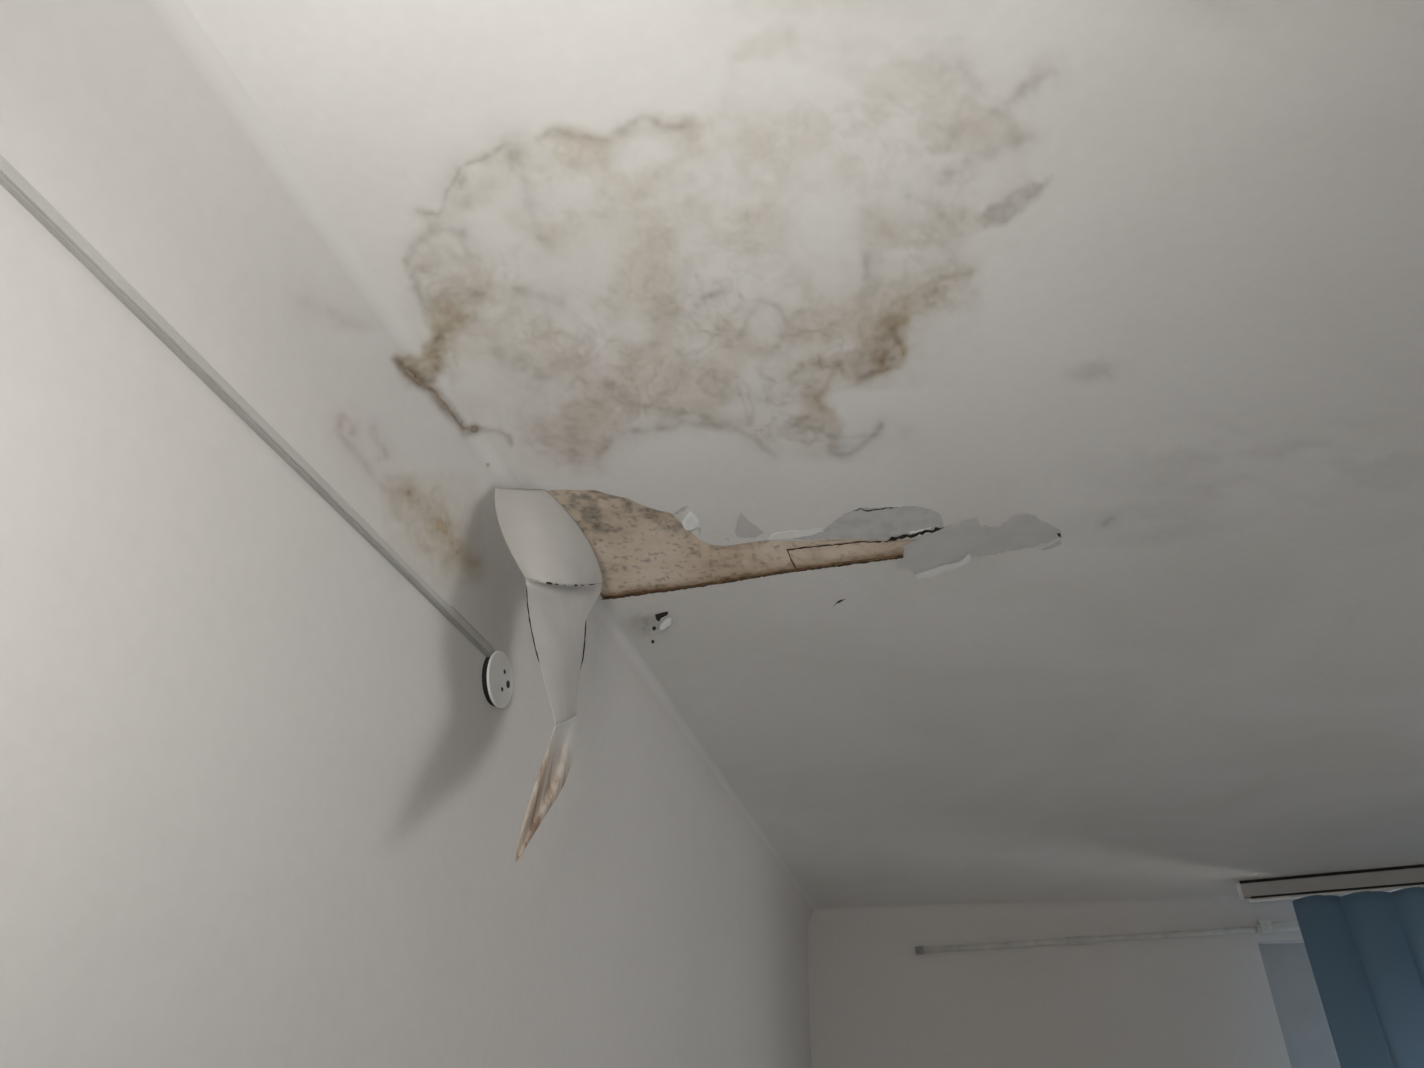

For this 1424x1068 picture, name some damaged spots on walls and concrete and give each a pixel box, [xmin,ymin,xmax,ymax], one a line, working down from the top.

peeling [495,487,944,862]
peeling [968,513,1062,558]